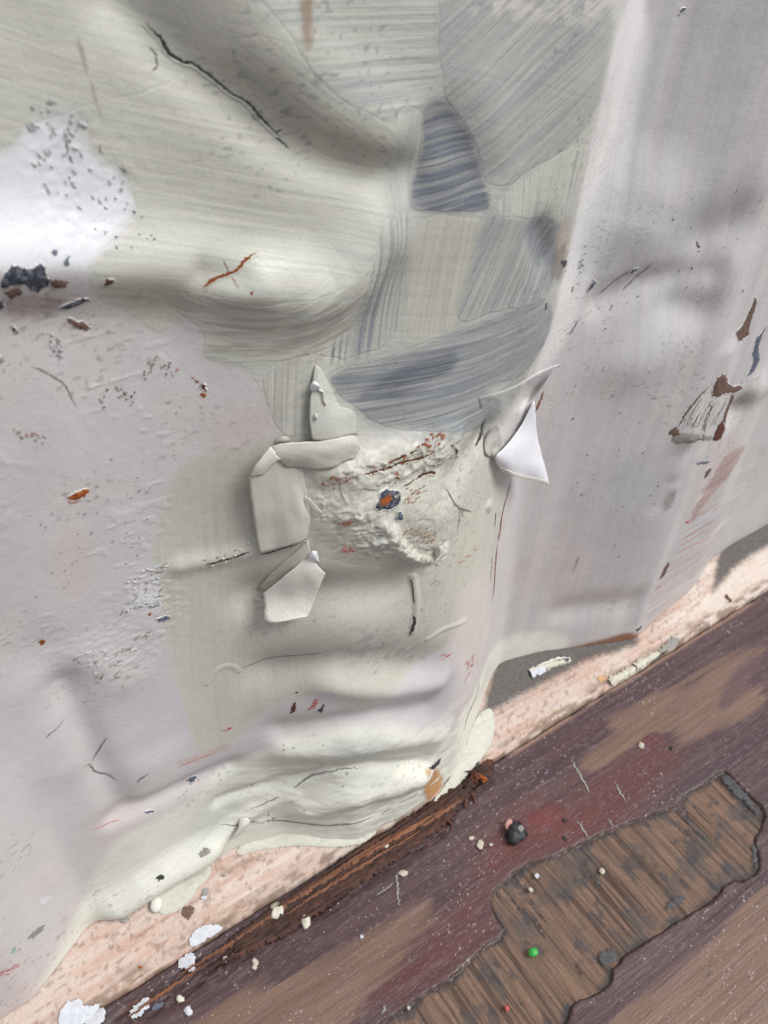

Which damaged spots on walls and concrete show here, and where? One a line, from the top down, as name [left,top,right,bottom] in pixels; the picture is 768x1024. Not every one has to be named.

crack [144,24,289,148]
spalling [0,263,68,310]
peeling [669,290,766,444]
crack [407,580,416,635]